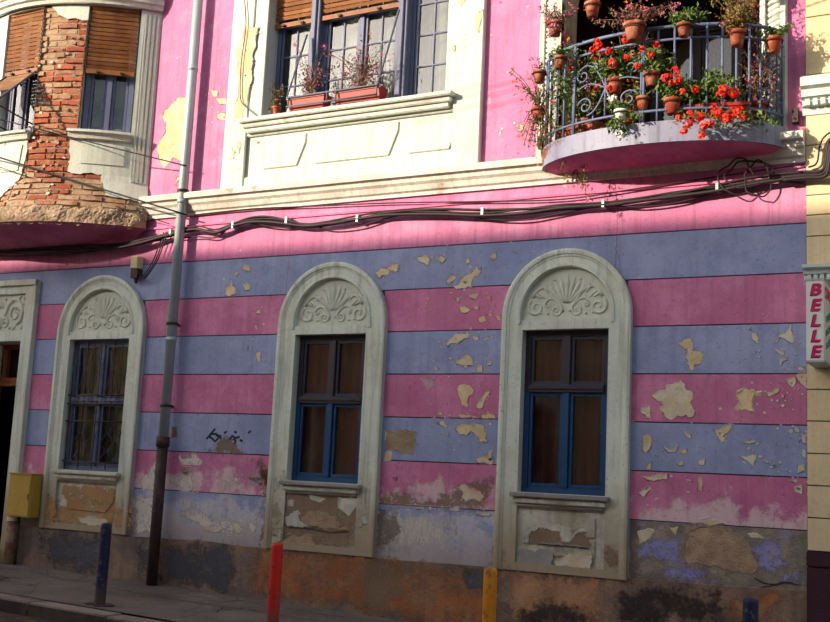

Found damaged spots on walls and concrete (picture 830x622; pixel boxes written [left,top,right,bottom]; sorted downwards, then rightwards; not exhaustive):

spalling [0,5,147,231]
peeling [154,96,186,186]
peeling [205,25,260,124]
peeling [632,380,696,507]
peeling [712,324,807,495]
peeling [134,461,156,534]
spalling [271,468,380,547]
water stain [360,480,494,609]
water stain [603,546,618,566]
spalling [629,507,807,591]
water stain [517,602,594,622]
water stain [614,585,732,622]